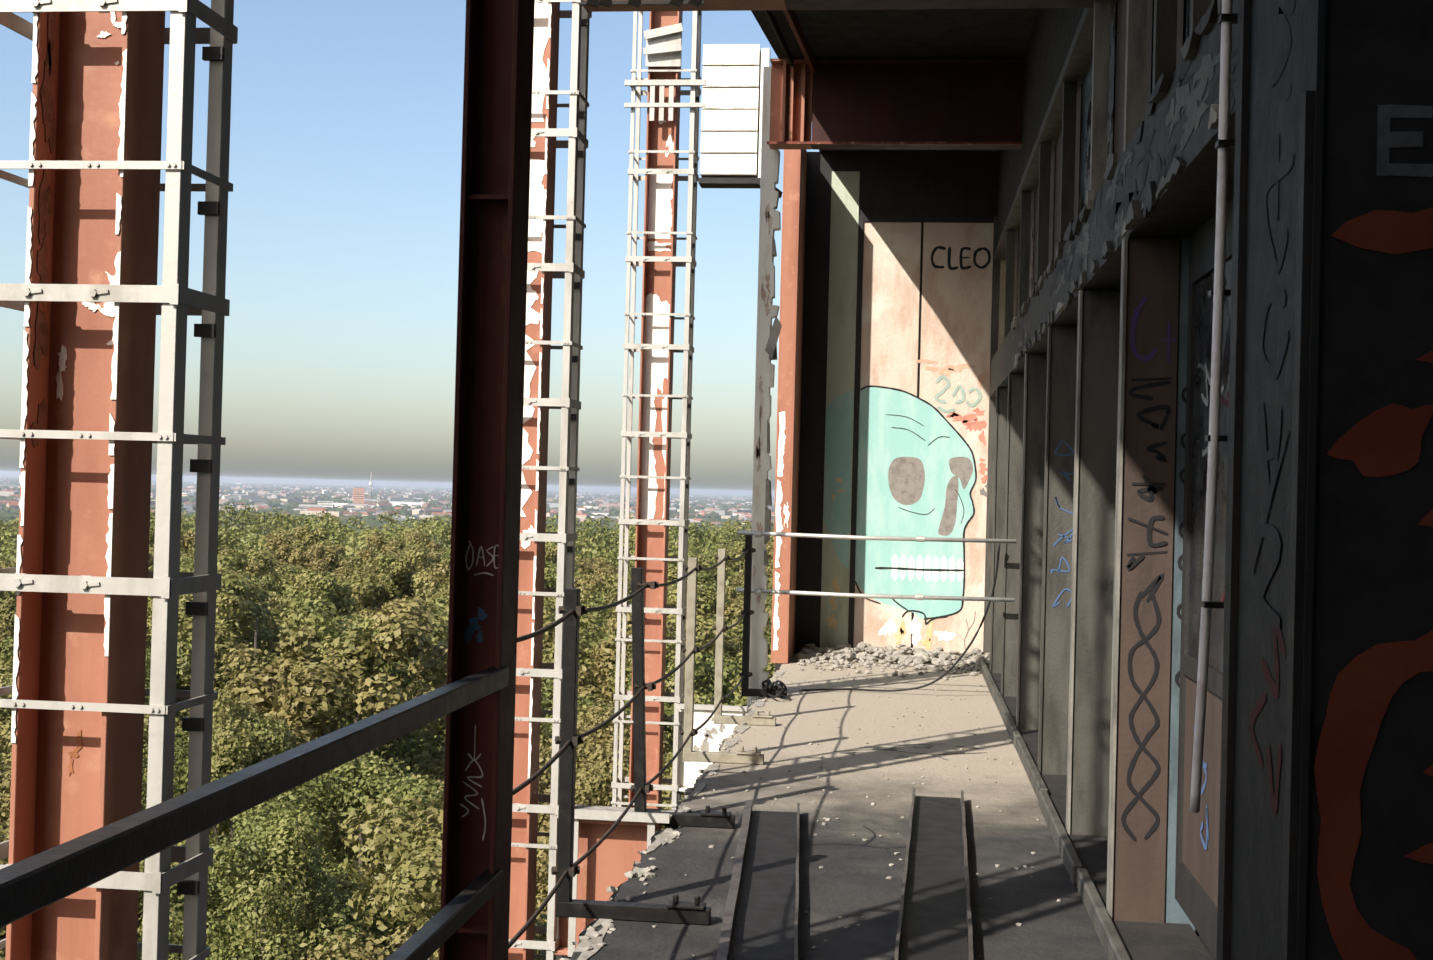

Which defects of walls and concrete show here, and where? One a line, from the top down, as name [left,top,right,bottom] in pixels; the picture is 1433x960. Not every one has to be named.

peeling [25,12,56,284]
peeling [97,12,128,285]
peeling [647,168,673,252]
peeling [658,120,674,157]
peeling [16,301,67,573]
peeling [82,302,120,577]
peeling [640,293,670,520]
spalling [678,149,790,812]
peeling [11,614,20,743]
spalling [574,919,612,960]
spalling [647,827,677,852]